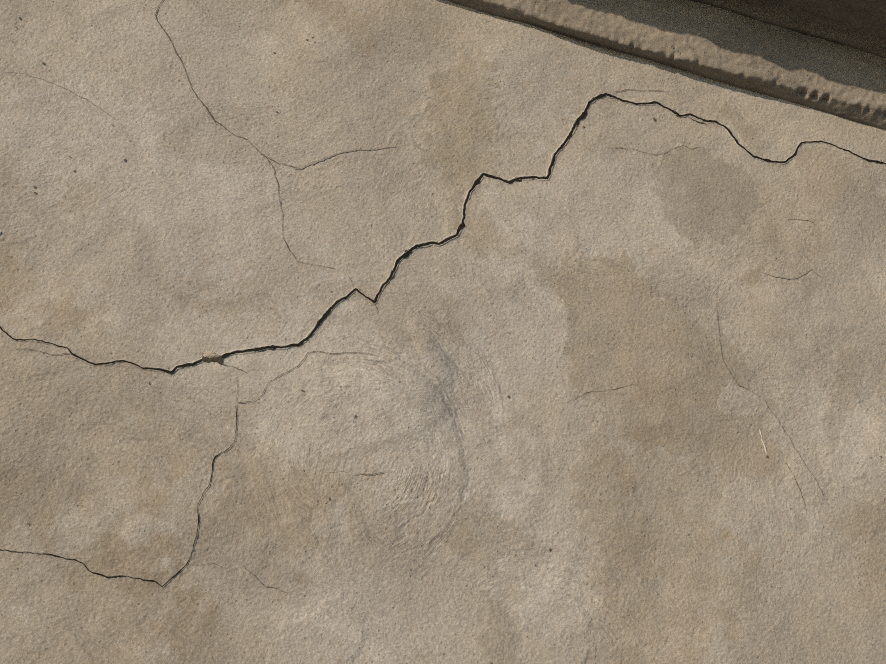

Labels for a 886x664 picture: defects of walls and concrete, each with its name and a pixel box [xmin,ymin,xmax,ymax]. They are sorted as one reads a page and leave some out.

crack [155,1,332,268]
crack [0,89,886,587]
damp [409,37,791,664]
damp [645,97,861,294]